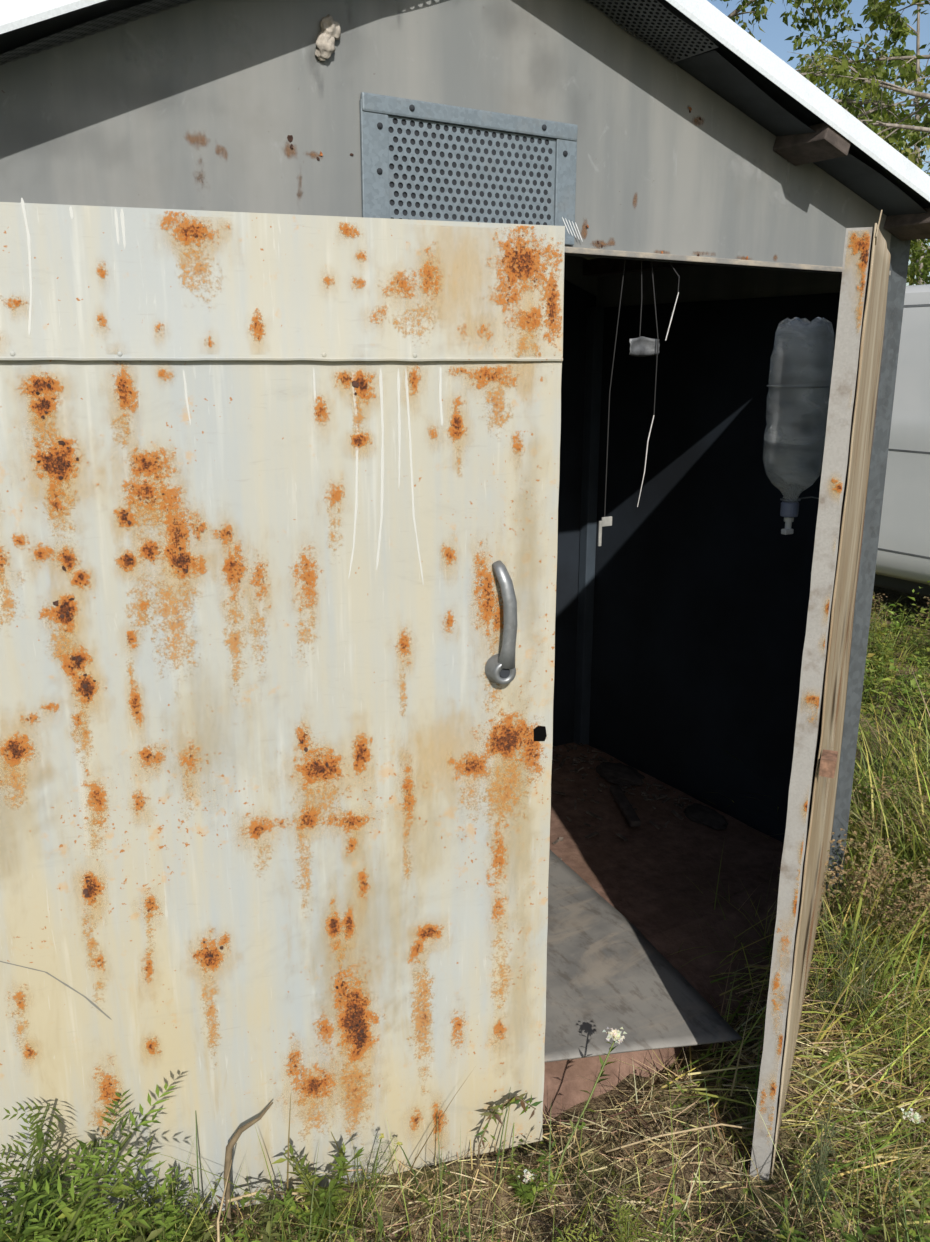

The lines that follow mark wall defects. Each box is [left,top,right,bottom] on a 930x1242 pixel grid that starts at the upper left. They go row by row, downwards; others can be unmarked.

corrosion [161,211,230,298]
corrosion [370,247,441,335]
corrosion [449,225,563,427]
corrosion [18,372,88,530]
corrosion [113,363,271,680]
corrosion [429,397,467,473]
corrosion [474,542,504,654]
corrosion [0,534,106,848]
corrosion [242,727,373,906]
corrosion [446,677,543,1045]
corrosion [193,928,230,1055]
corrosion [286,869,385,1134]